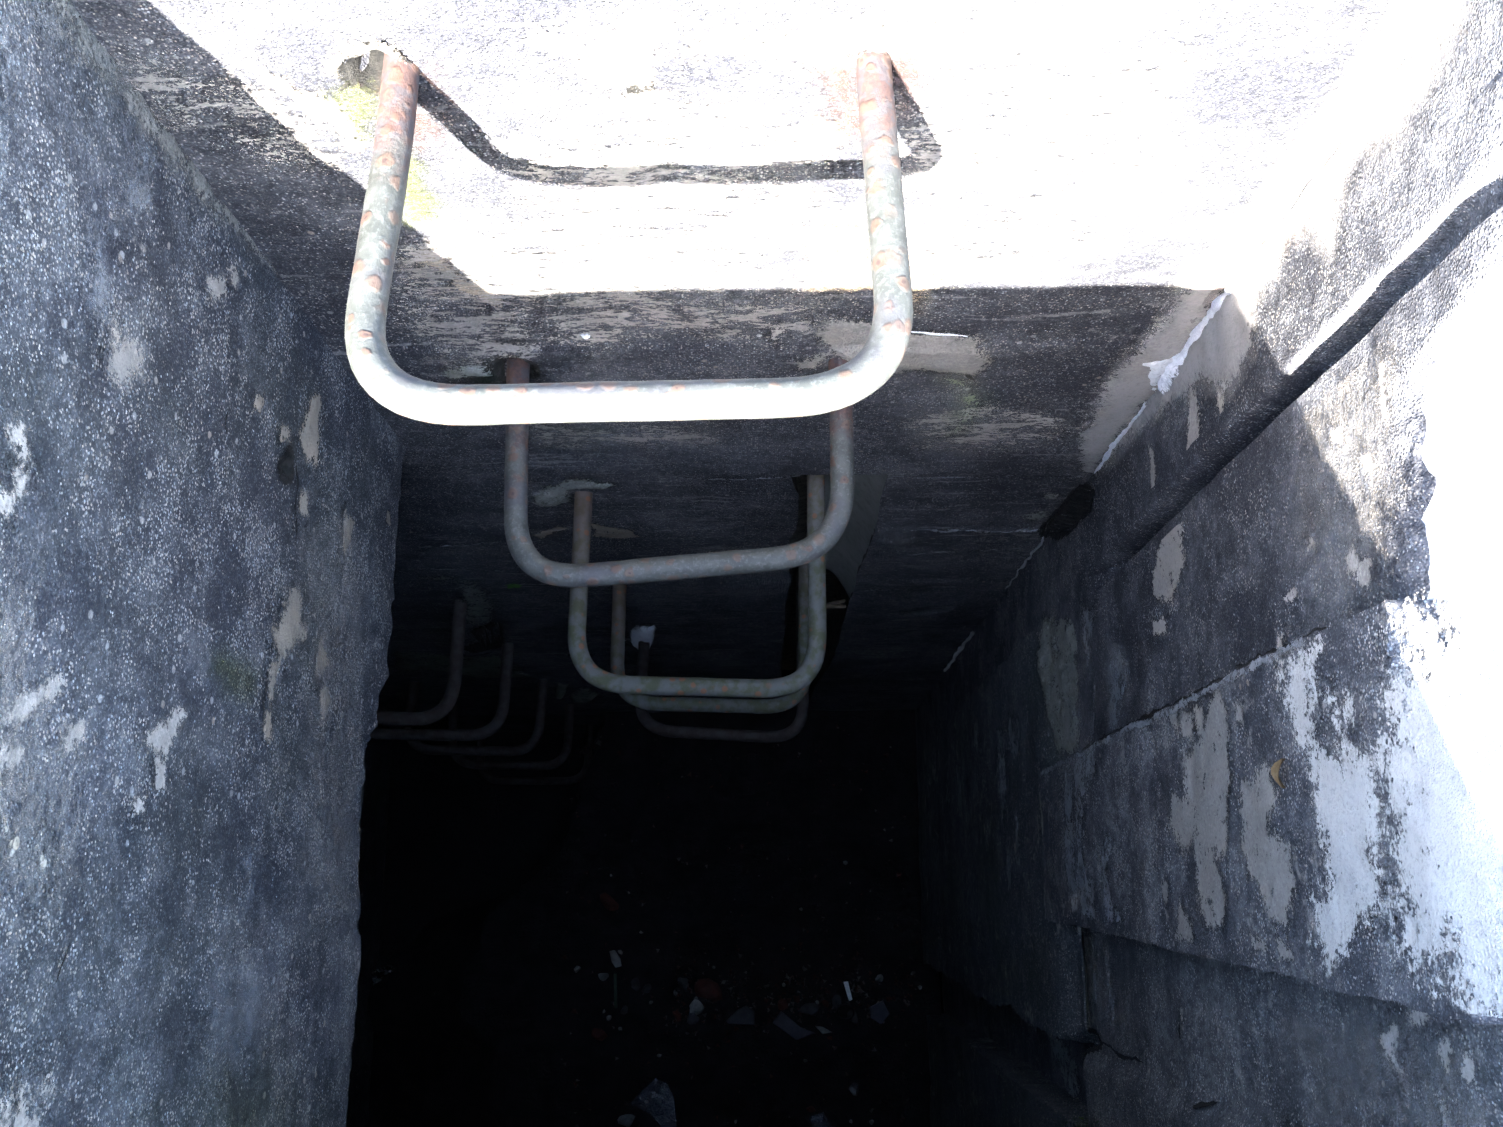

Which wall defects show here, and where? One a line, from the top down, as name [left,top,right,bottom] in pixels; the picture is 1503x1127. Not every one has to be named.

damp [118,82,278,279]
damp [404,162,438,224]
spalling [391,238,824,382]
spalling [493,92,832,237]
corrosion [796,227,871,294]
corrosion [909,255,942,304]
damp [1074,55,1410,477]
spalling [261,587,332,746]
damp [629,625,656,649]
spalling [1151,522,1186,636]
spalling [1160,558,1503,1076]
crack [1099,1040,1143,1063]